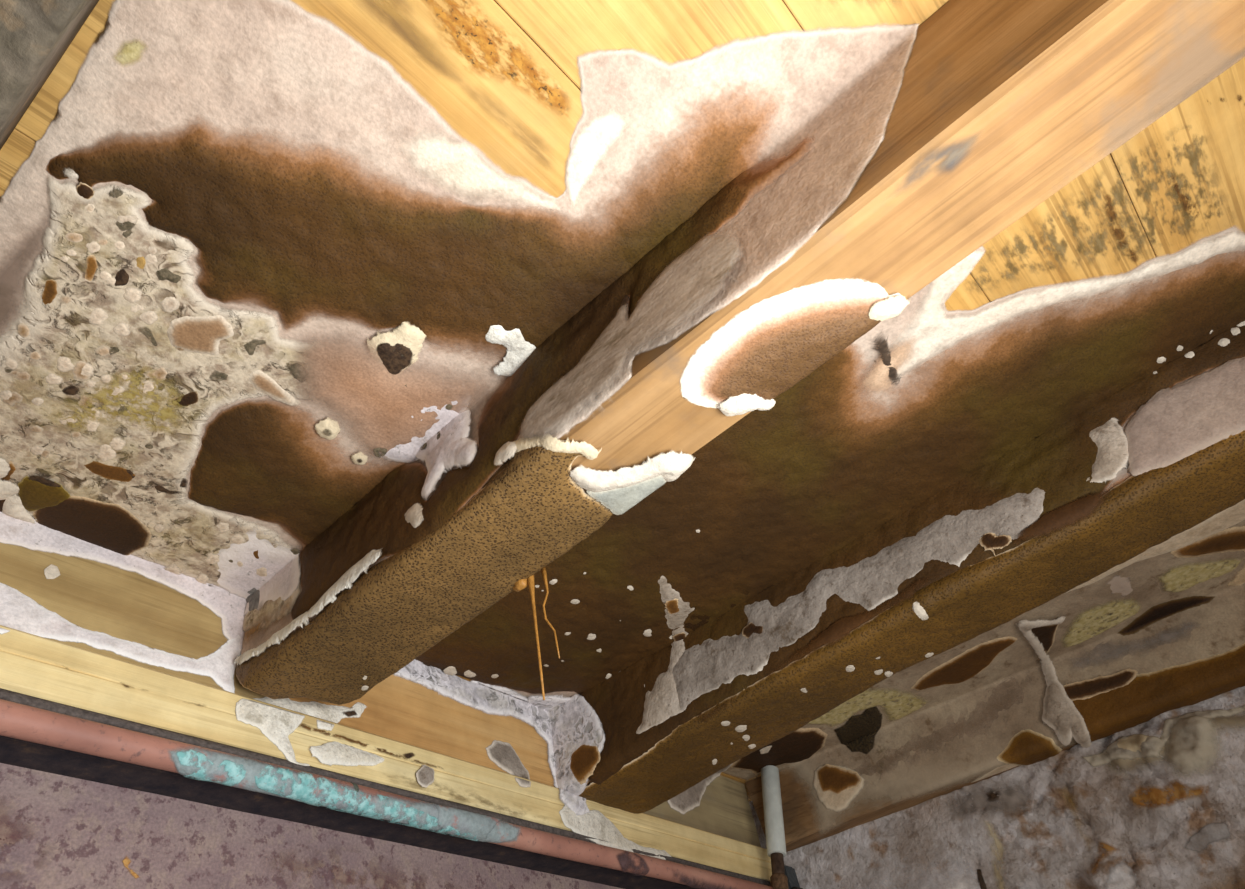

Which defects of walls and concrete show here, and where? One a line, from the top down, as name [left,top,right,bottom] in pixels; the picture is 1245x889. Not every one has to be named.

leakage [367,0,447,68]
leakage [427,0,566,110]
spalling [76,182,123,212]
leakage [977,140,1220,286]
spalling [115,257,181,286]
spalling [42,279,58,304]
spalling [244,340,265,355]
leakage [520,231,739,438]
spalling [171,391,199,407]
spalling [84,461,135,482]
leakage [834,707,882,754]
leakage [1210,714,1245,729]